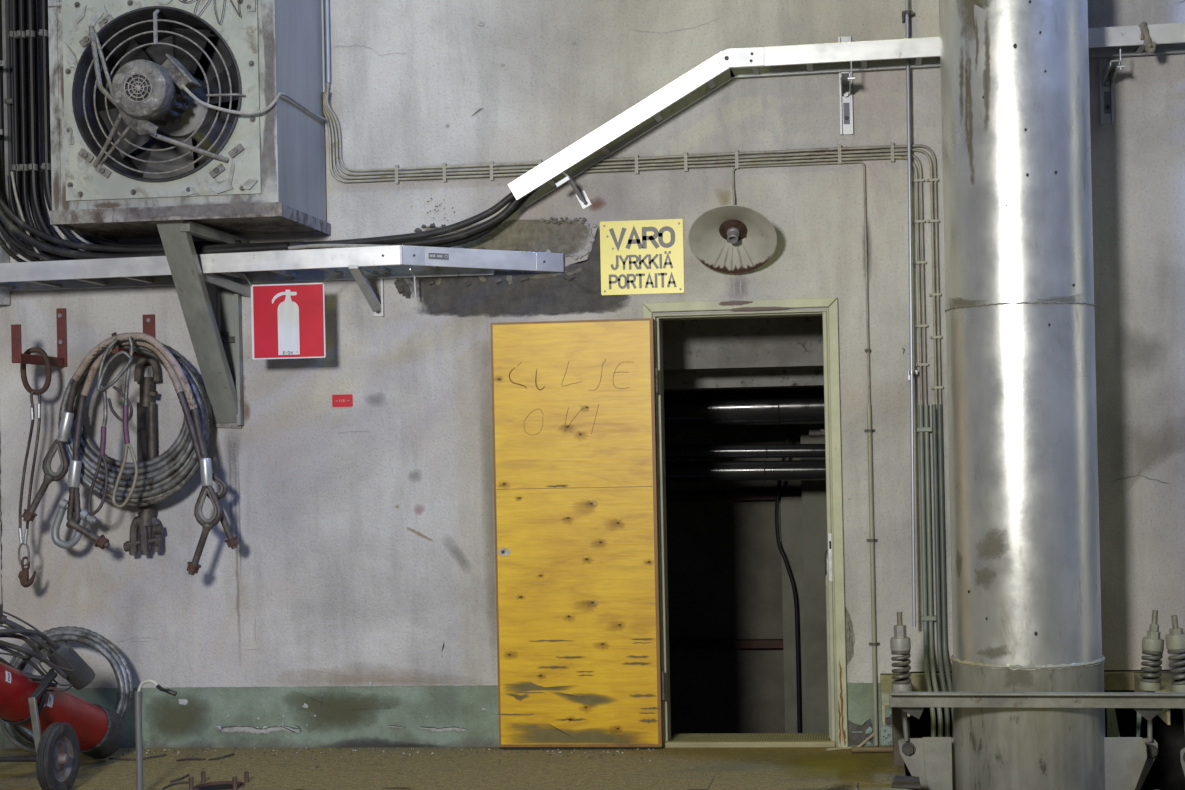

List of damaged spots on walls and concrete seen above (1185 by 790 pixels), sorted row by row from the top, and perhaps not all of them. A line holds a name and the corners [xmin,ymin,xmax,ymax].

spalling [414,217,597,260]